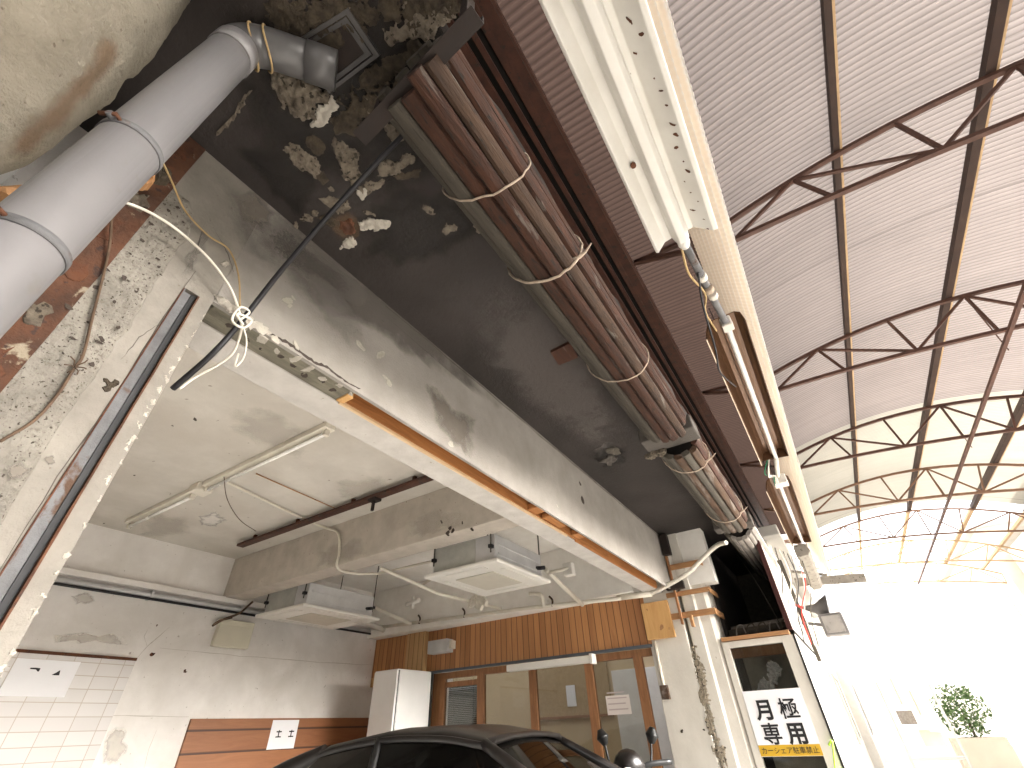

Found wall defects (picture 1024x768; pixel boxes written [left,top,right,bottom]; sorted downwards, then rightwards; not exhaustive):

peeling [263,0,462,250]
leakage [431,390,470,451]